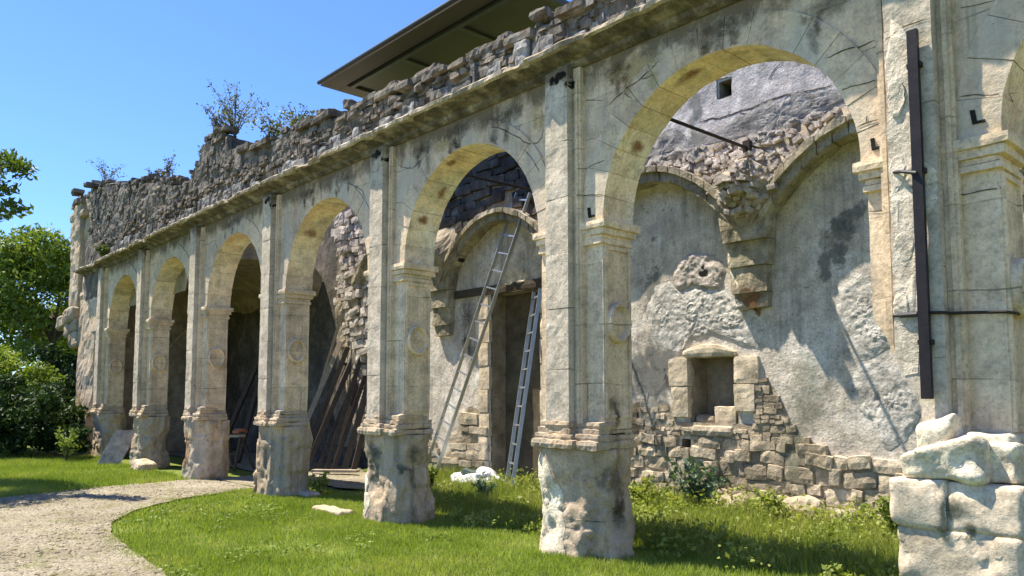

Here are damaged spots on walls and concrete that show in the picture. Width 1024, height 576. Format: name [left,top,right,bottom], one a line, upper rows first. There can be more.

crack [828,19,924,58]
crack [591,61,658,105]
crack [696,61,875,124]
crack [490,127,543,171]
flaking render [645,89,845,166]
water stain [818,201,867,282]
flaking render [646,252,765,356]
corrosion [740,289,760,316]